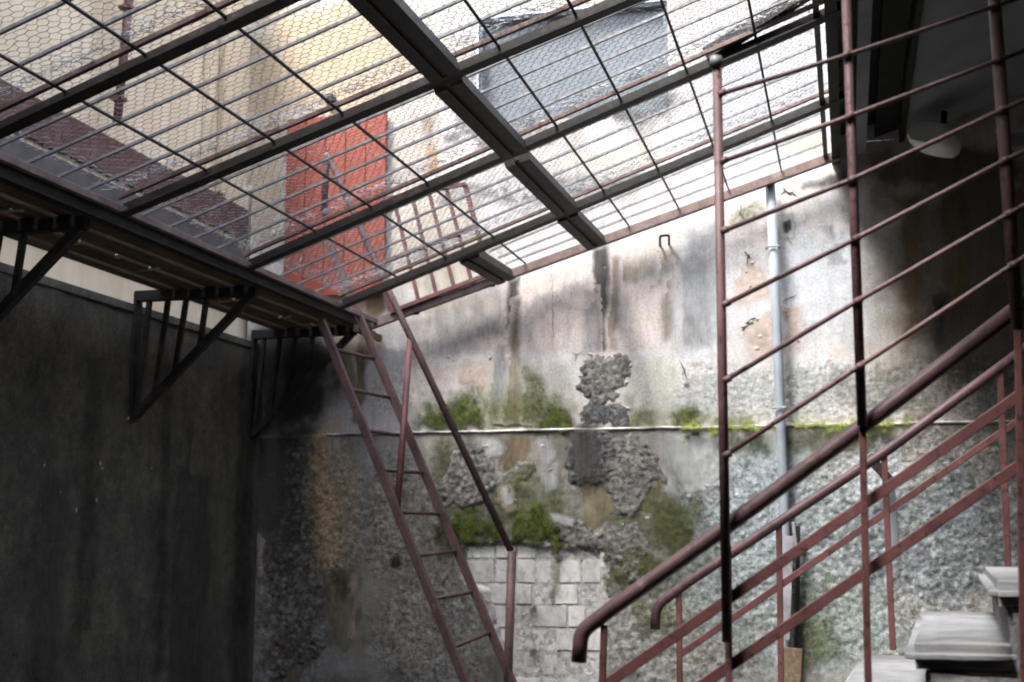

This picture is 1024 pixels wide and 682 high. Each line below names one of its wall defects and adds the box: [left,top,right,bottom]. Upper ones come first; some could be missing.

leakage [353,336,365,422]
leakage [492,278,546,468]
spalling [437,352,719,584]
leakage [587,247,637,351]